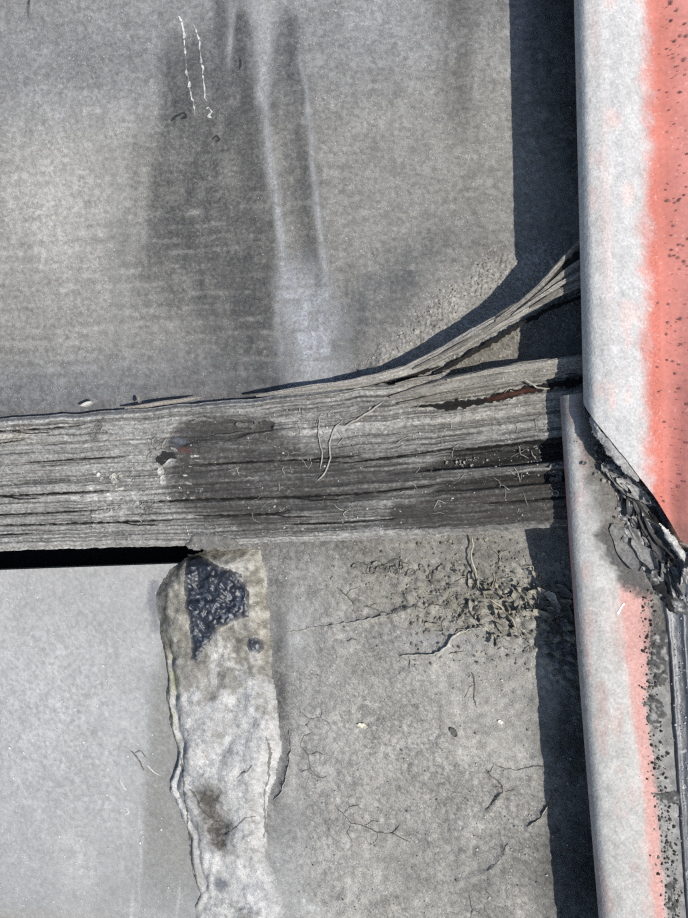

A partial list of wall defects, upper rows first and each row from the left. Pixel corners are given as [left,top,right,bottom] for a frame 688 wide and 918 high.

water stain [189,116,233,324]
water stain [296,293,329,377]
crack [336,558,443,619]
crack [465,673,477,707]
crack [300,713,329,778]
crack [486,764,545,811]
crack [335,805,411,843]